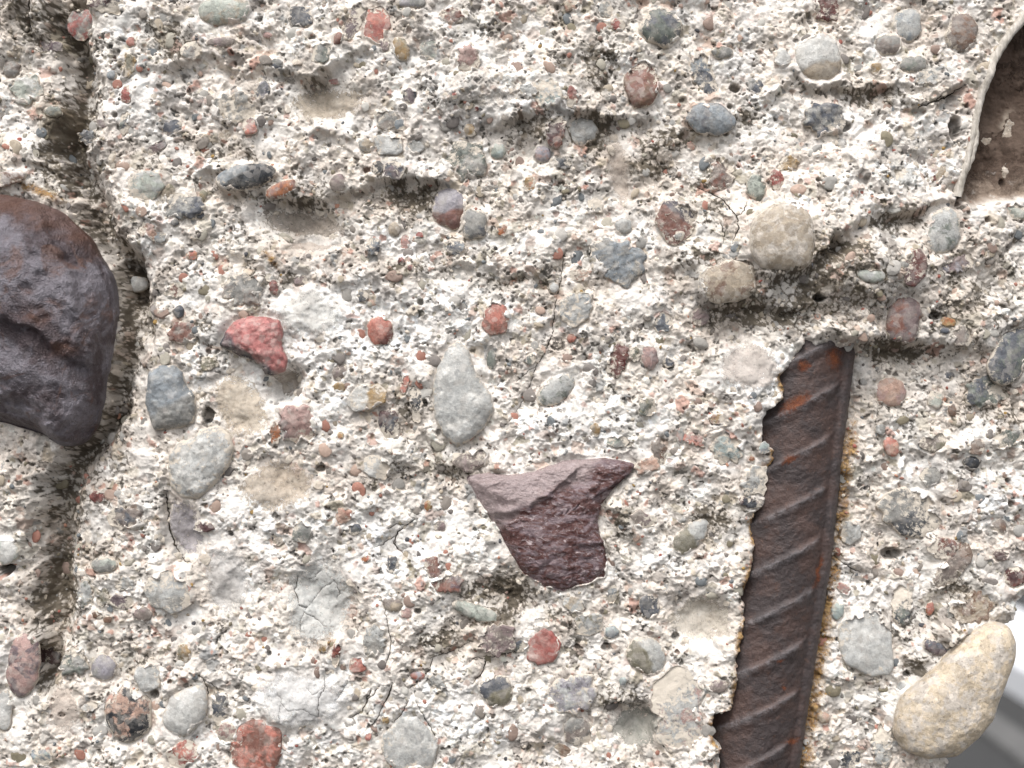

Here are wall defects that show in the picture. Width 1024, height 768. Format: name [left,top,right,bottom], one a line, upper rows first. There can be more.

spalling [953,12,1024,200]
crack [294,571,340,631]
spalling [668,340,855,768]
rust [788,421,858,768]